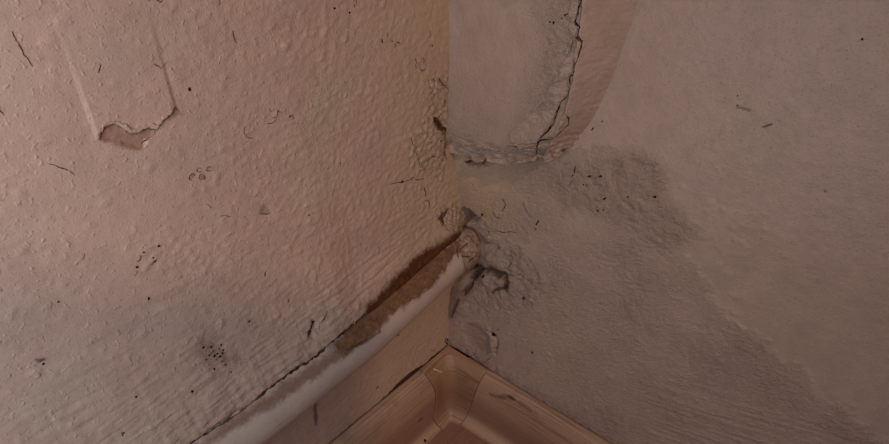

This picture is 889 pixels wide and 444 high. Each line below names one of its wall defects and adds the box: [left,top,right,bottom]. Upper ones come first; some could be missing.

peeling [100,107,180,150]
flaking render [509,0,580,145]
crack [536,0,583,154]